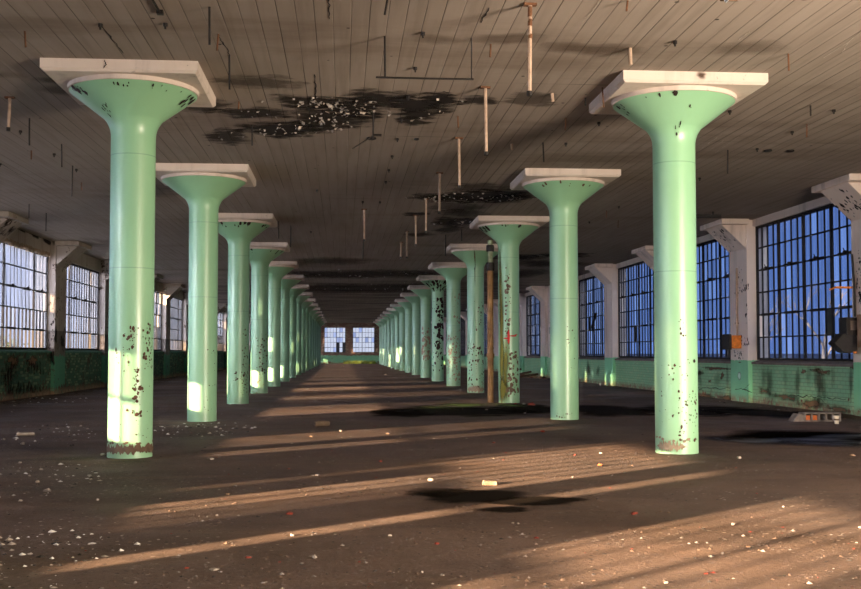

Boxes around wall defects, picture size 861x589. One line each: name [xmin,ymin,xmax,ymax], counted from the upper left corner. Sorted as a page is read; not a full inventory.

peeling [115,323,153,421]
peeling [421,280,484,393]
water stain [579,405,655,417]
peeling [656,359,727,452]
water stain [698,405,799,418]